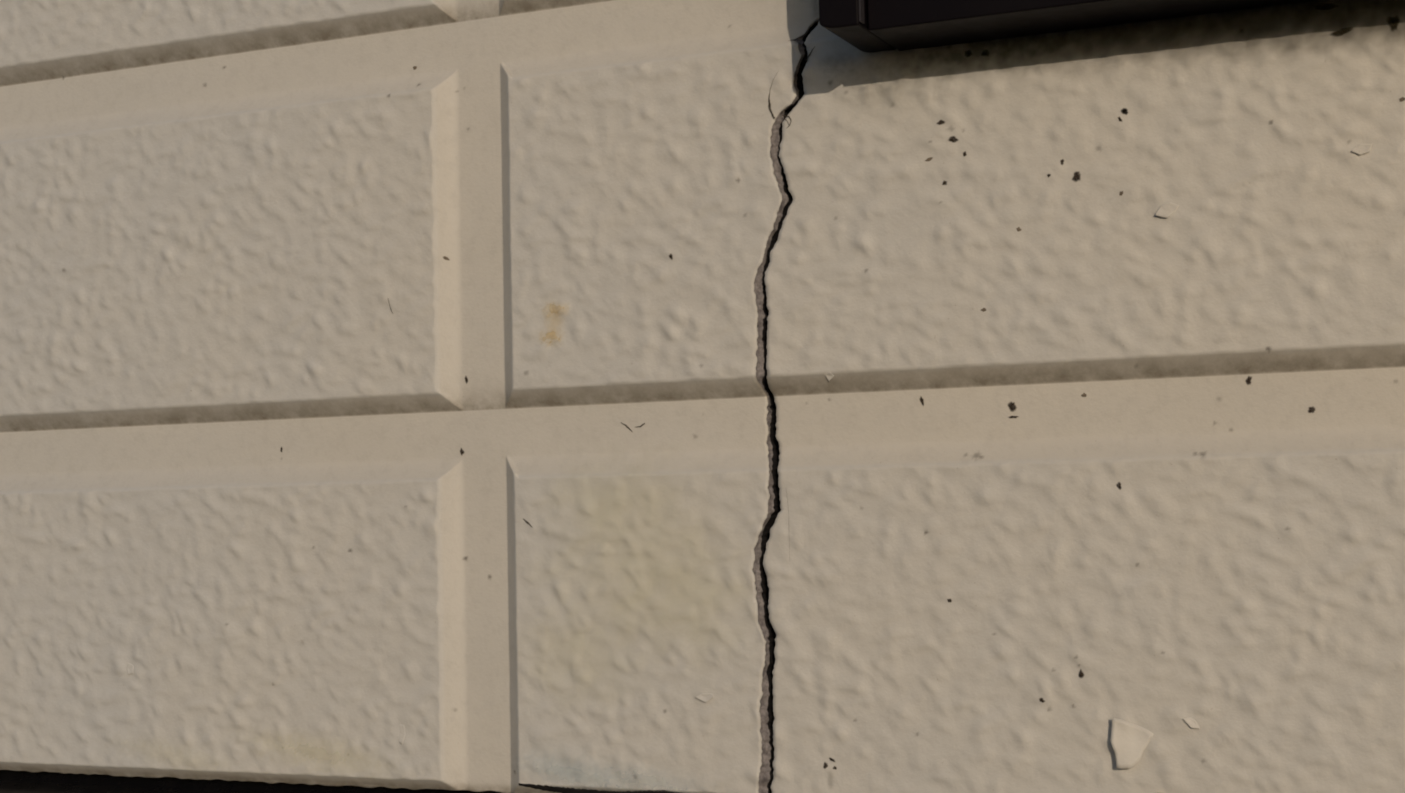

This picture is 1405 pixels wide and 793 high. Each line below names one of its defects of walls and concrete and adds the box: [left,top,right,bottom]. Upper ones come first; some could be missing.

crack [752,19,819,793]
peeling [1111,718,1153,769]